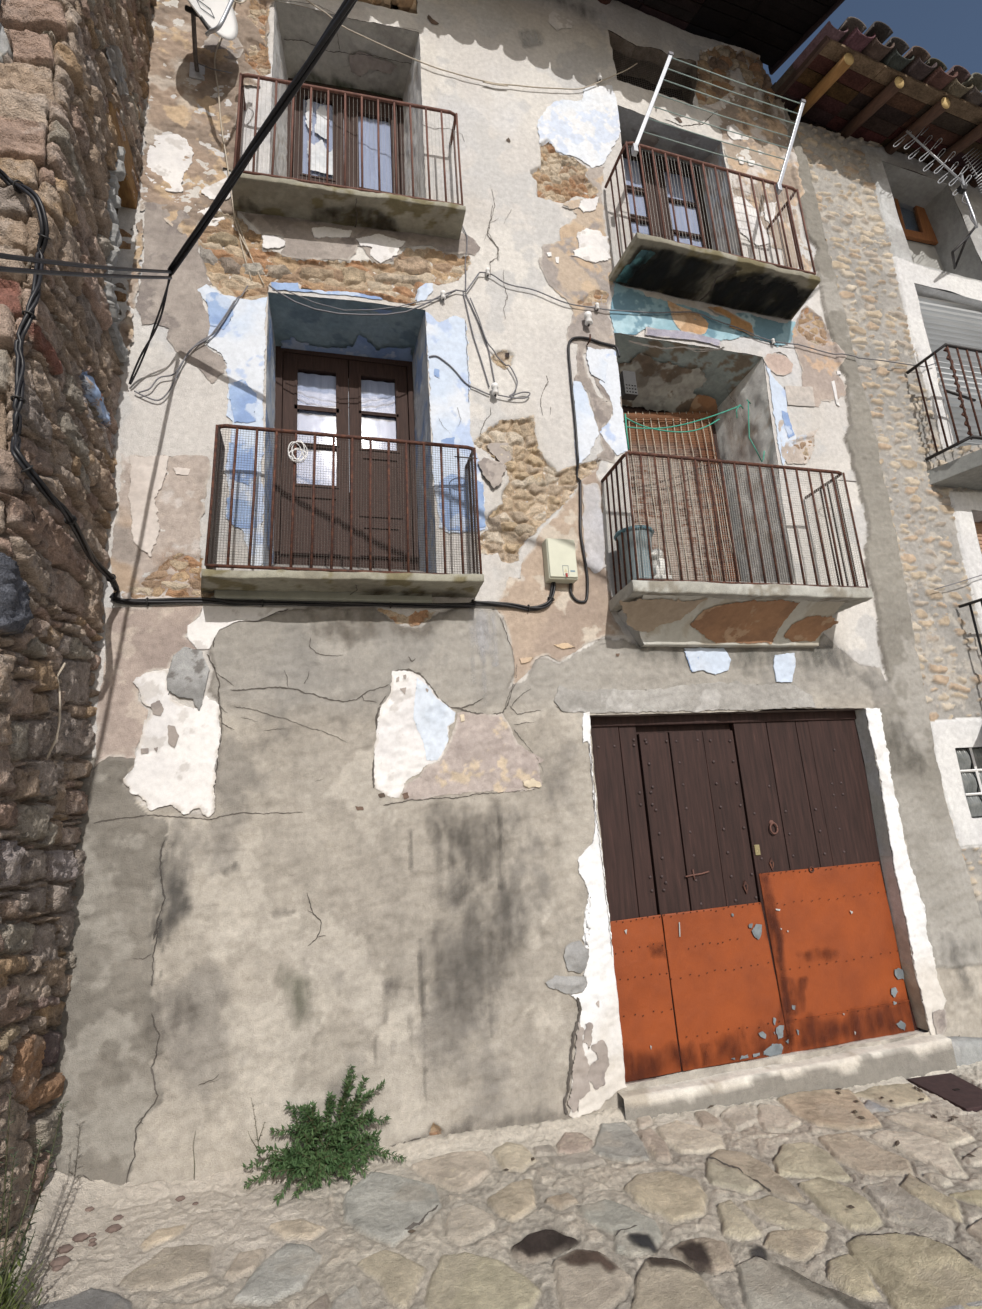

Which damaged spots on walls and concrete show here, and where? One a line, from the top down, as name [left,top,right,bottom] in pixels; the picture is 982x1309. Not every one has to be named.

flaking render [95,0,847,817]
damp [157,876,189,939]
crack [95,609,560,1183]
damp [437,818,504,999]
peeling [568,1022,610,1112]